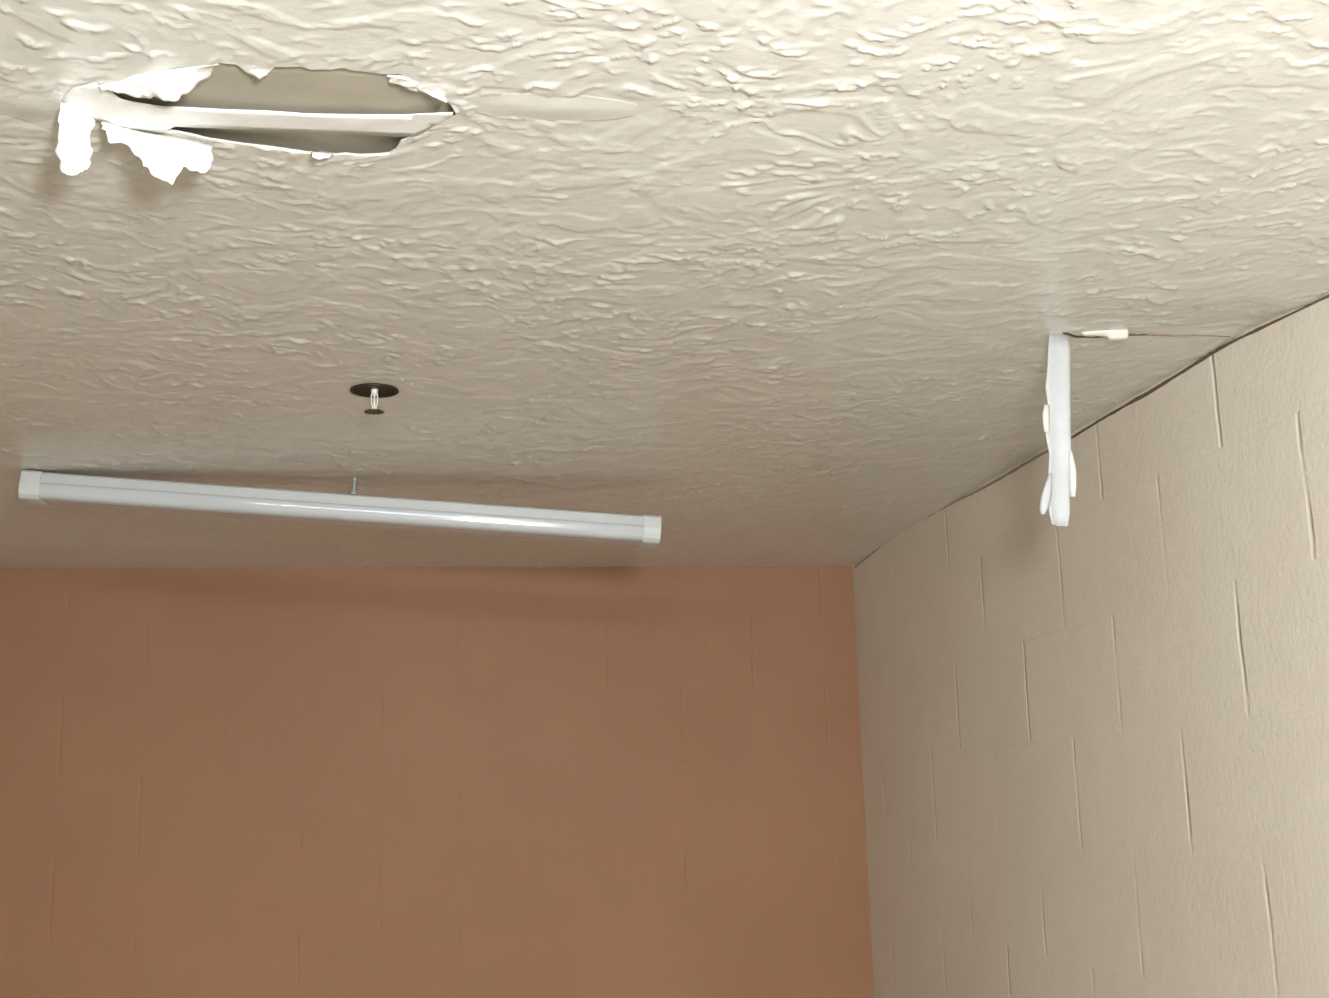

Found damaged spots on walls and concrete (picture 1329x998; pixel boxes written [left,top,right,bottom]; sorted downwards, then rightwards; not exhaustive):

peeling [0,63,639,185]
peeling [1039,334,1077,526]